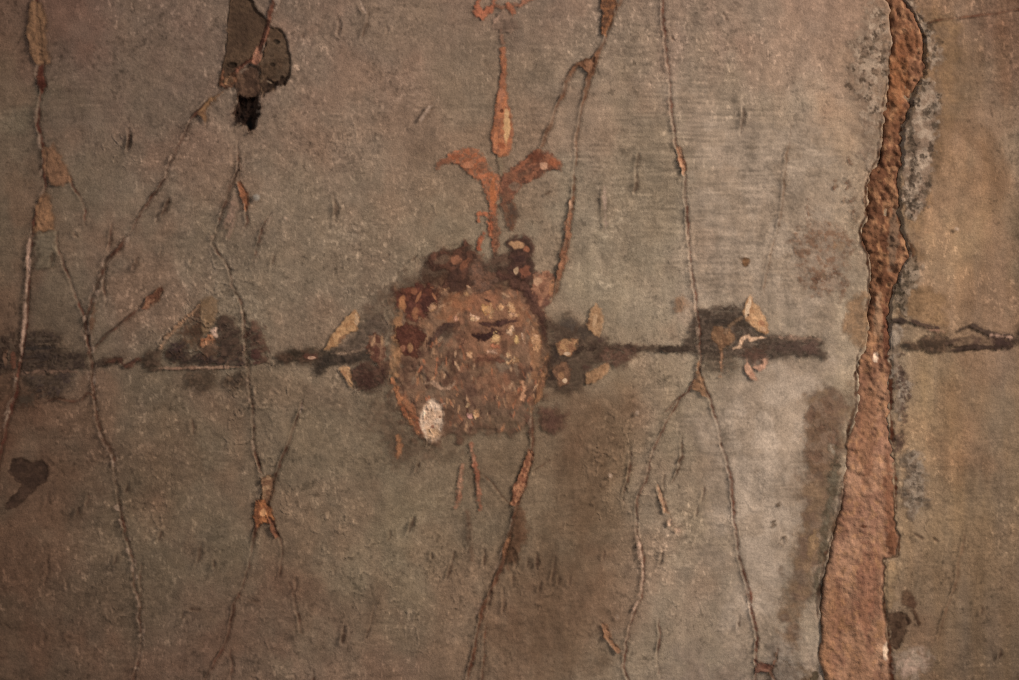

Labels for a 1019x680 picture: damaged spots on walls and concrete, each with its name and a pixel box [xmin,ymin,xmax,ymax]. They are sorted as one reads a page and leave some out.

damp [6,458,49,509]
crack [0,0,87,455]
crack [51,0,280,466]
spalling [219,0,290,134]
crack [249,399,303,574]
flaking render [420,399,444,441]
crack [468,418,535,680]
crack [541,0,622,294]
crack [623,98,716,680]
crack [721,444,778,679]
damp [698,349,836,660]
crack [816,0,990,680]